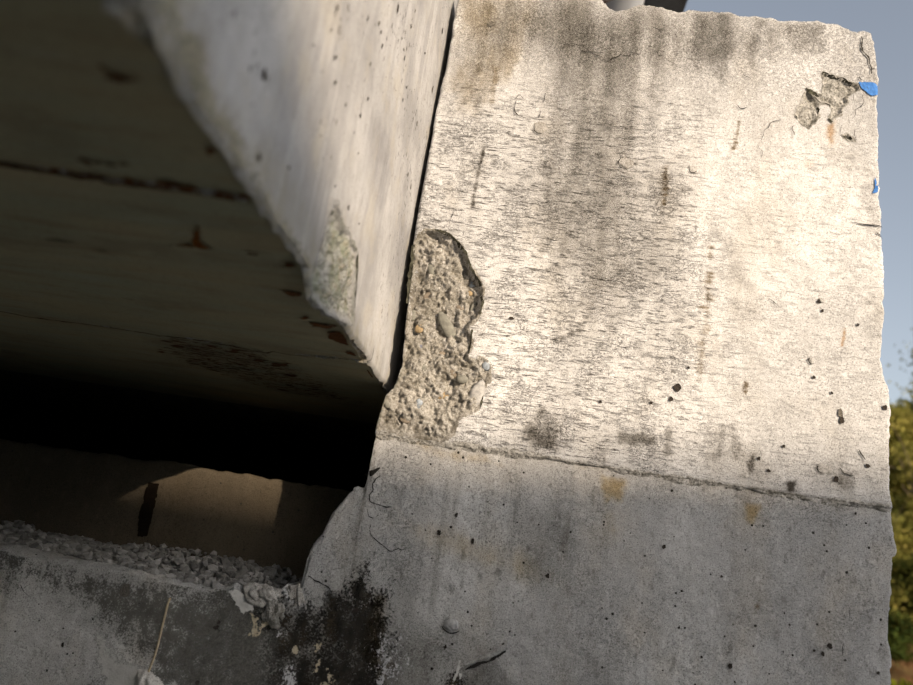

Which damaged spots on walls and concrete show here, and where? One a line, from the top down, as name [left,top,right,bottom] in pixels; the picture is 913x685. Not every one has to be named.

spalling [102,0,235,174]
spalling [794,71,860,130]
spalling [258,199,493,443]
crack [365,467,404,552]
leakage [0,551,418,685]